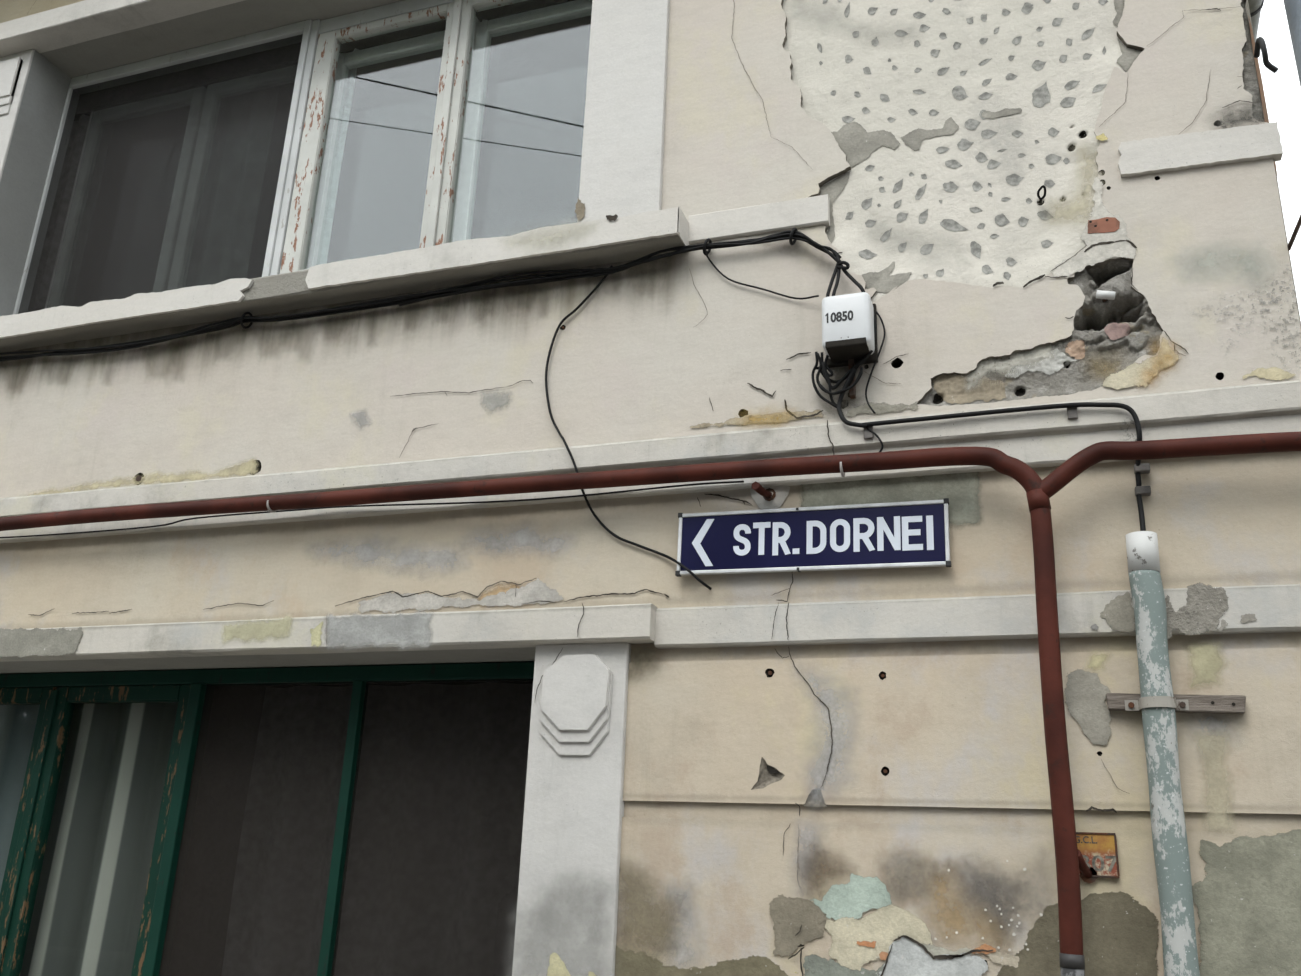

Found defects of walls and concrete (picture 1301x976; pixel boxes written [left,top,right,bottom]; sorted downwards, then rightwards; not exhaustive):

crack [1147,6,1240,46]
crack [732,0,812,169]
crack [1179,71,1253,134]
flaking render [782,0,1182,417]
peeling [0,627,83,658]
crack [772,574,833,890]
crack [788,925,804,976]
leakage [798,831,844,888]
peeling [769,873,1061,976]
leakage [892,861,1017,939]
peeling [1081,891,1159,976]
peeling [1192,829,1301,976]